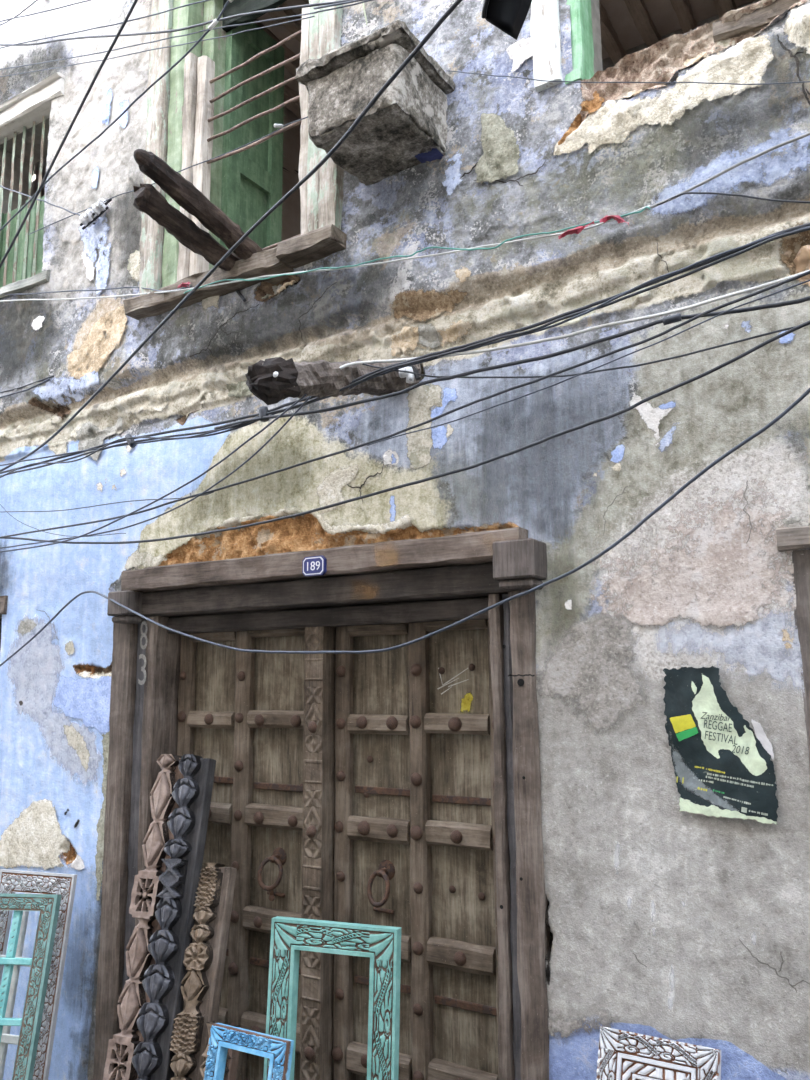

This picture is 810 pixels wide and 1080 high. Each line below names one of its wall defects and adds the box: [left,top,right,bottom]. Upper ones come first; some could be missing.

peeling [554,0,807,155]
crack [777,34,810,105]
peeling [415,148,463,196]
peeling [475,113,521,183]
spalling [779,222,810,285]
peeling [28,306,127,420]
peeling [48,392,167,461]
peeling [383,383,458,470]
peeling [629,392,676,452]
spalling [125,465,519,570]
peeling [0,616,111,901]
crack [739,939,810,993]